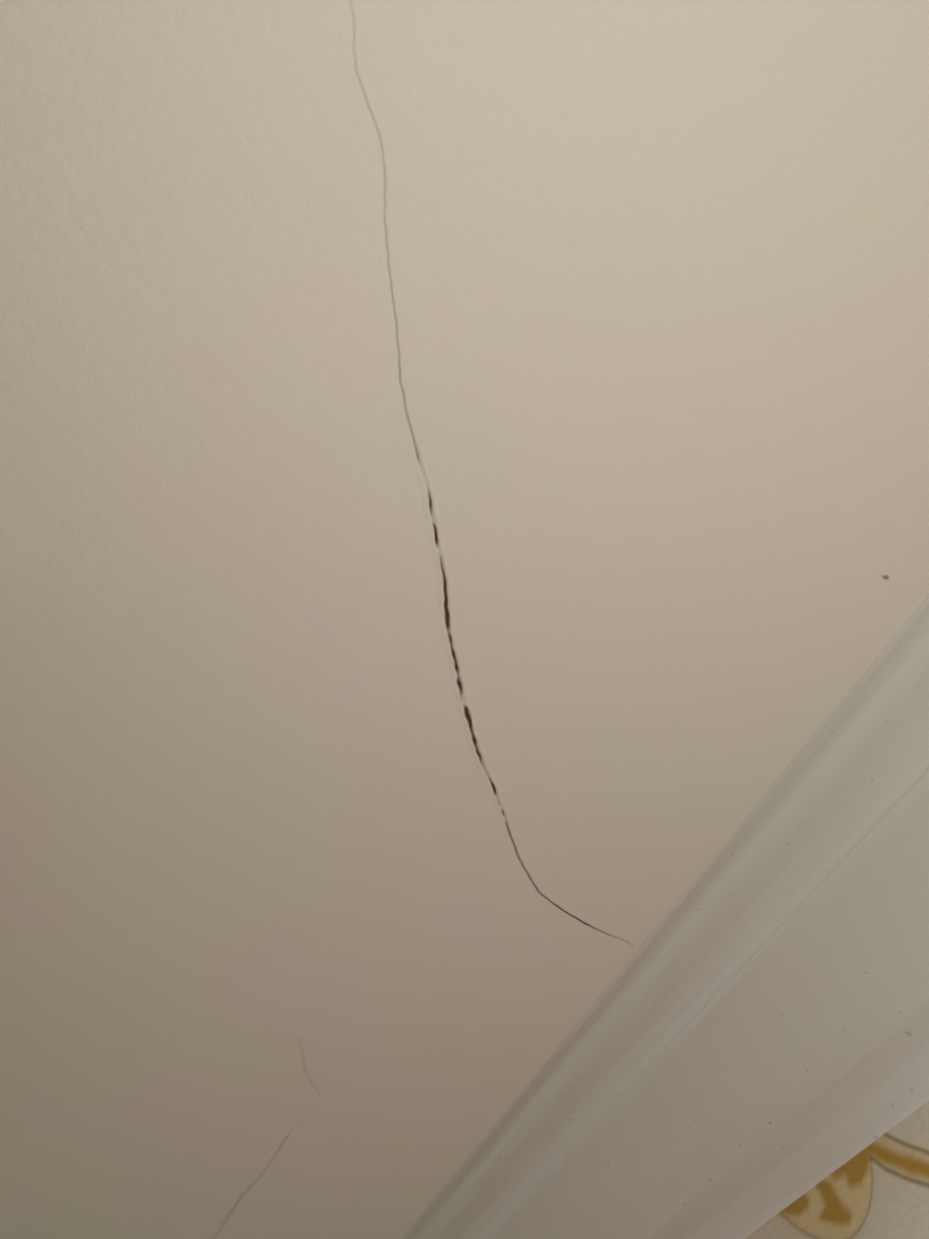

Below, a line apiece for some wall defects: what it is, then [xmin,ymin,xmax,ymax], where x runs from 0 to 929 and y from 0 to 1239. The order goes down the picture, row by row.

crack [408,442,511,824]